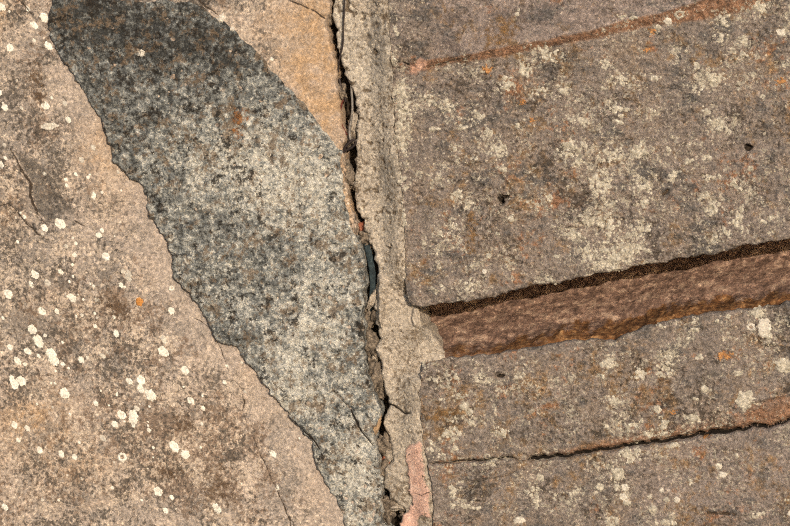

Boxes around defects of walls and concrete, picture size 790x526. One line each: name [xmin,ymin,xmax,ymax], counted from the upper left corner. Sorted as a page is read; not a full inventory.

crack [290,0,410,526]
crack [433,417,790,480]